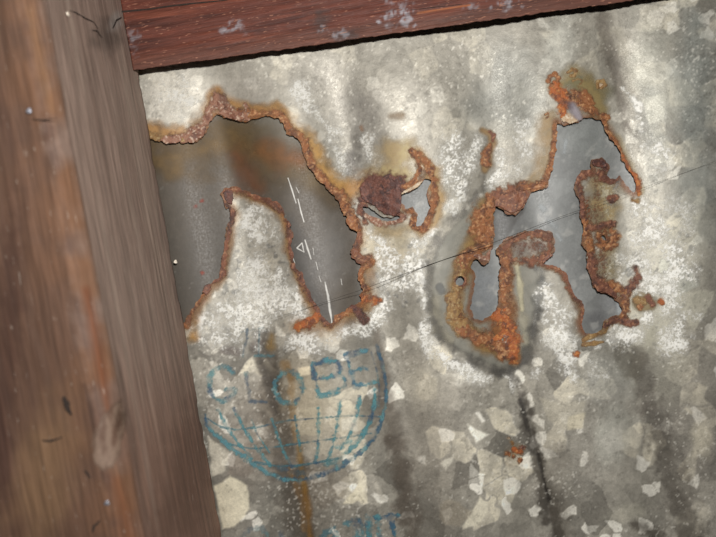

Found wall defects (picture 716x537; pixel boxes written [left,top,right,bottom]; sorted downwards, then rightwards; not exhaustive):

corrosion [148,67,702,385]
corrosion [505,437,526,464]